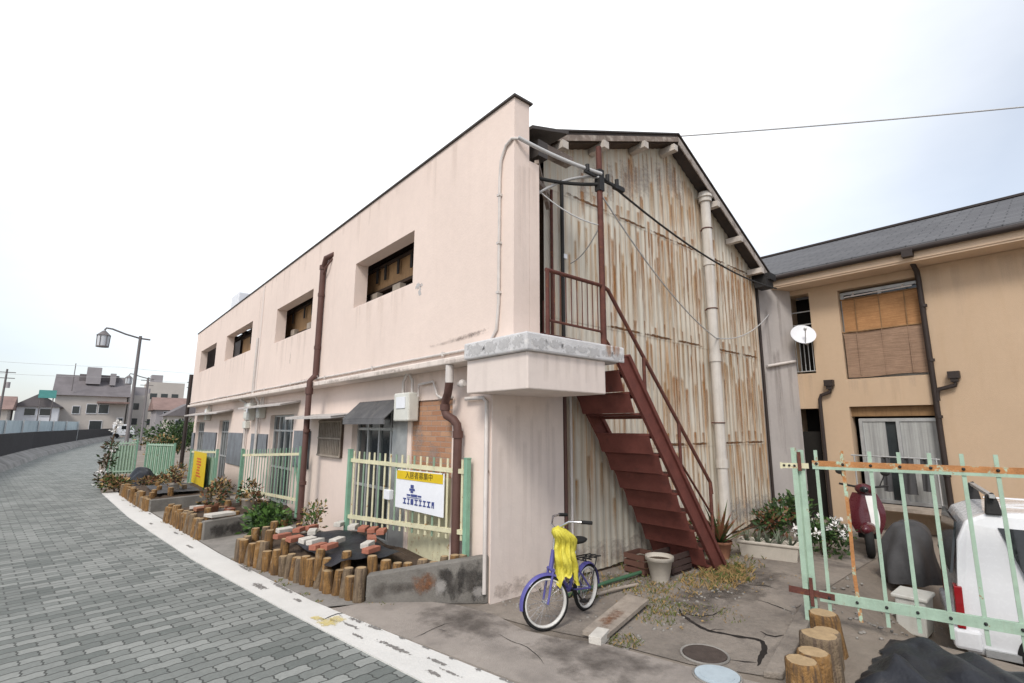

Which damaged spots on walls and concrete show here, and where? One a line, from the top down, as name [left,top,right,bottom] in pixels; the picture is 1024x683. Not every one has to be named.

rust [574,155,701,321]
rust [607,313,708,455]
water stain [436,569,483,600]
crack [679,609,782,666]